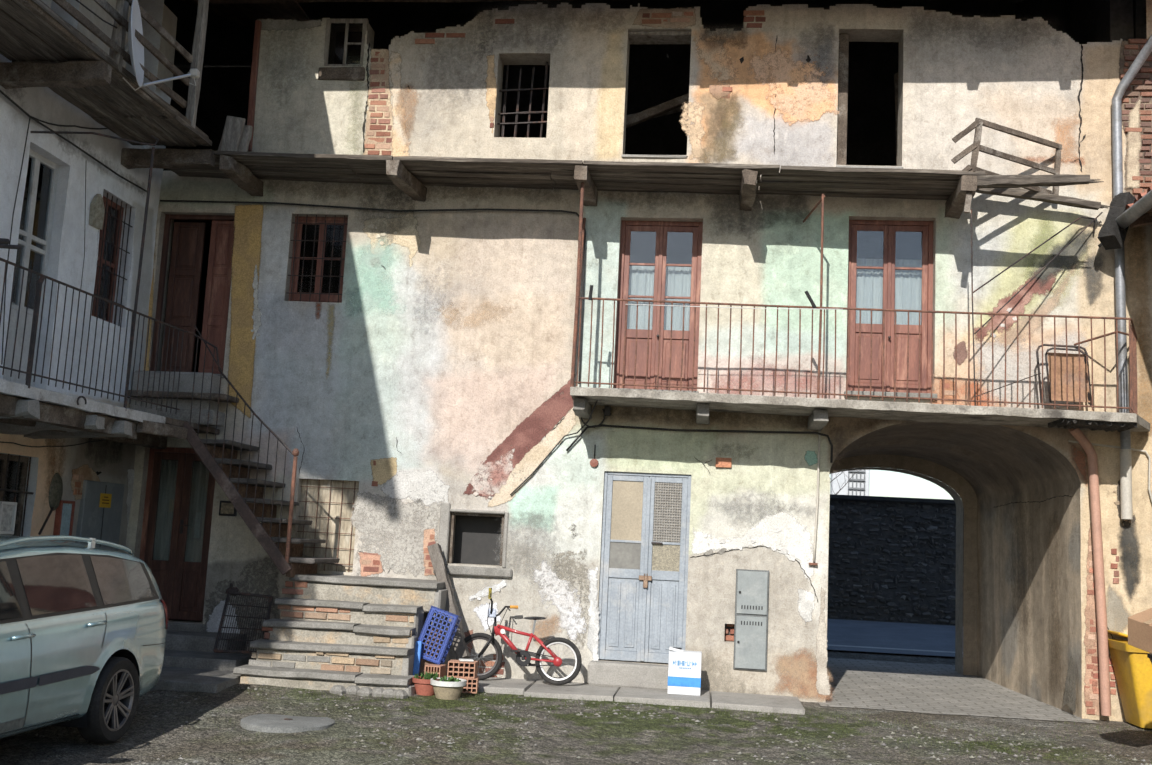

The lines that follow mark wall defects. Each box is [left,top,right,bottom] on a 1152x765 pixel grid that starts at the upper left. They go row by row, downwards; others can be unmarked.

flaking render [633,7,696,29]
flaking render [363,48,410,156]
peeling [679,85,733,163]
peeling [749,48,839,126]
crack [1073,44,1086,172]
flaking render [1119,39,1152,199]
peeling [463,376,576,507]
flaking render [350,457,450,577]
peeling [532,561,600,661]
peeling [692,510,831,695]
flaking render [1063,523,1116,715]
water stain [1120,519,1140,598]